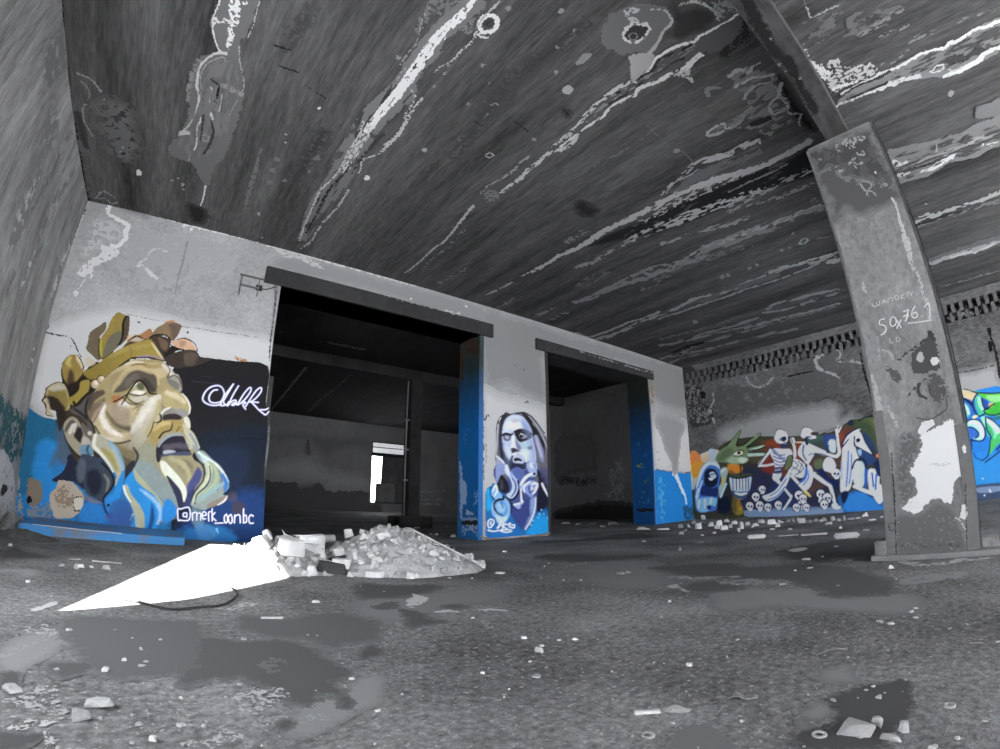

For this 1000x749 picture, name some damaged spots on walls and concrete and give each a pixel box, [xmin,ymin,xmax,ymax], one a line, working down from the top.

damp [0,0,832,324]
peeling [902,419,968,530]